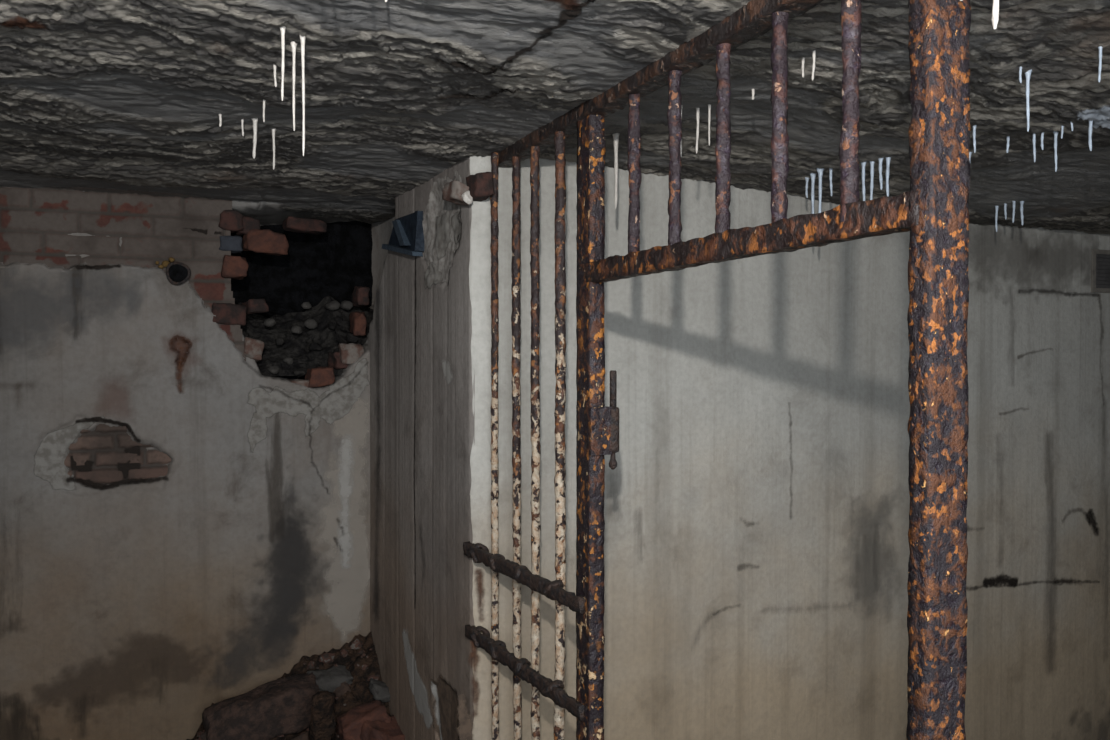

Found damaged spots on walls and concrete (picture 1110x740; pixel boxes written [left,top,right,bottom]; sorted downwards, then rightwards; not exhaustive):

flaking render [0,187,373,453]
flaking render [34,416,171,490]
leakage [225,517,315,681]
rust [476,570,484,607]
crack [967,575,1088,590]
rust [470,640,479,703]